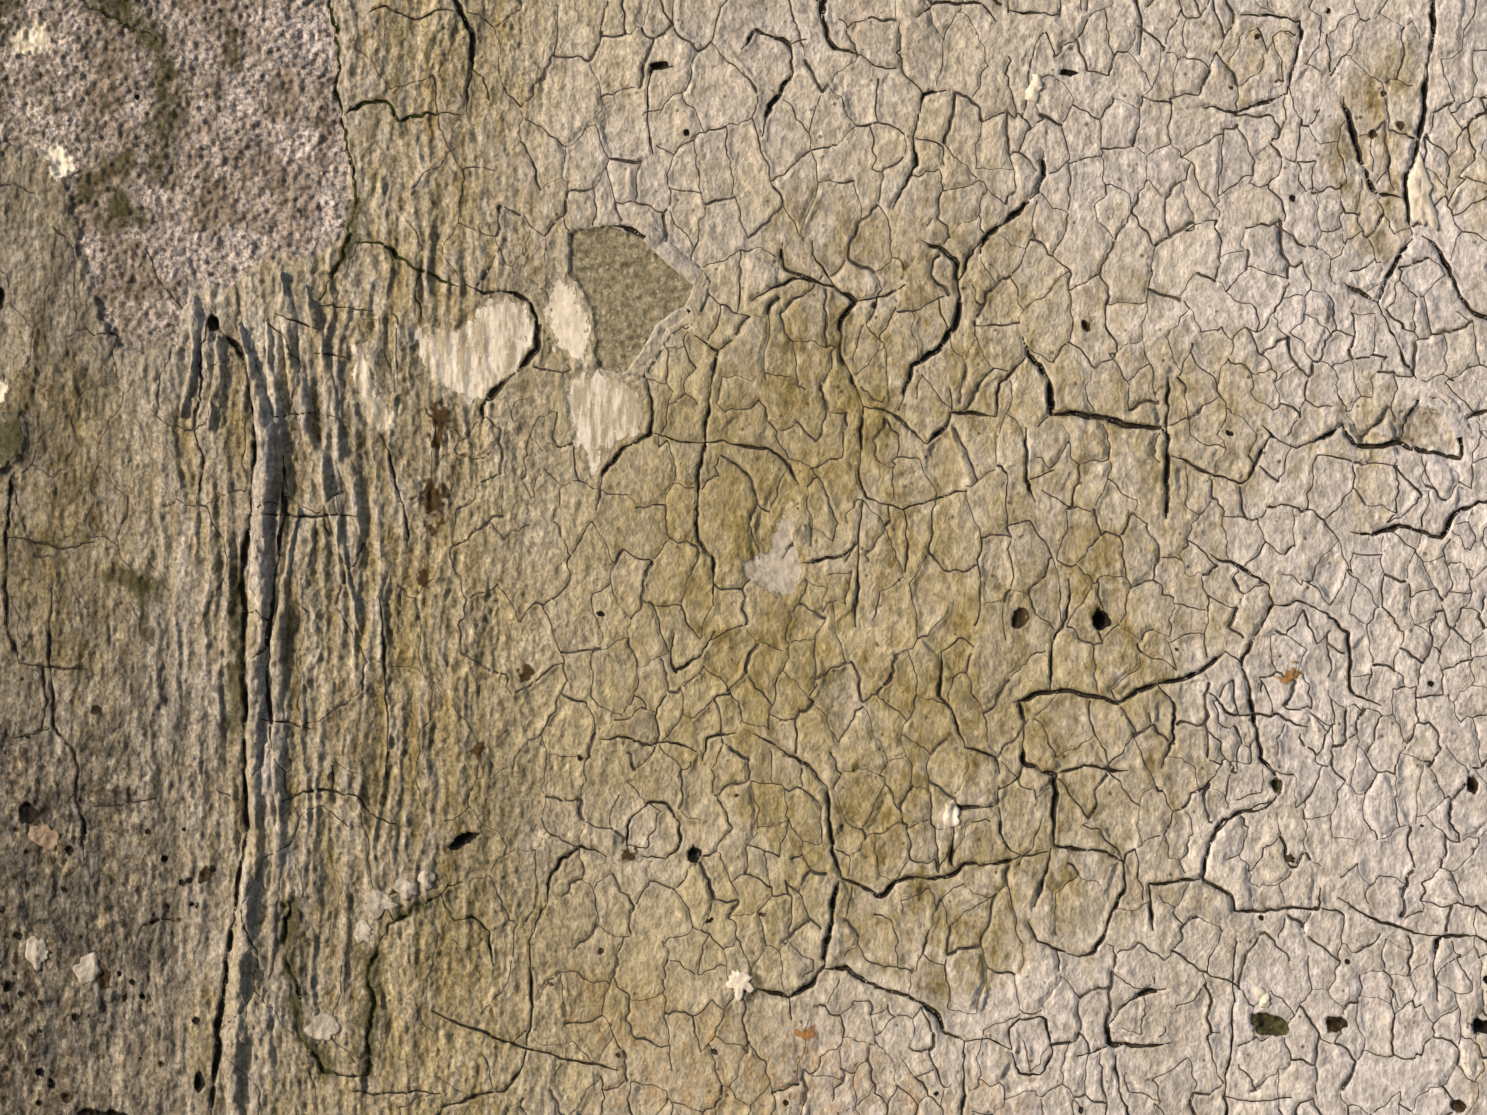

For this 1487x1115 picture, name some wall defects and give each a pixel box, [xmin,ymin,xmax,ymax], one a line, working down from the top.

peeling [9,19,51,59]
crack [0,183,34,194]
peeling [43,142,78,181]
spalling [409,226,711,475]
peeling [741,499,812,596]
crack [319,0,1487,1115]
crack [155,306,494,1115]
crack [137,918,179,938]